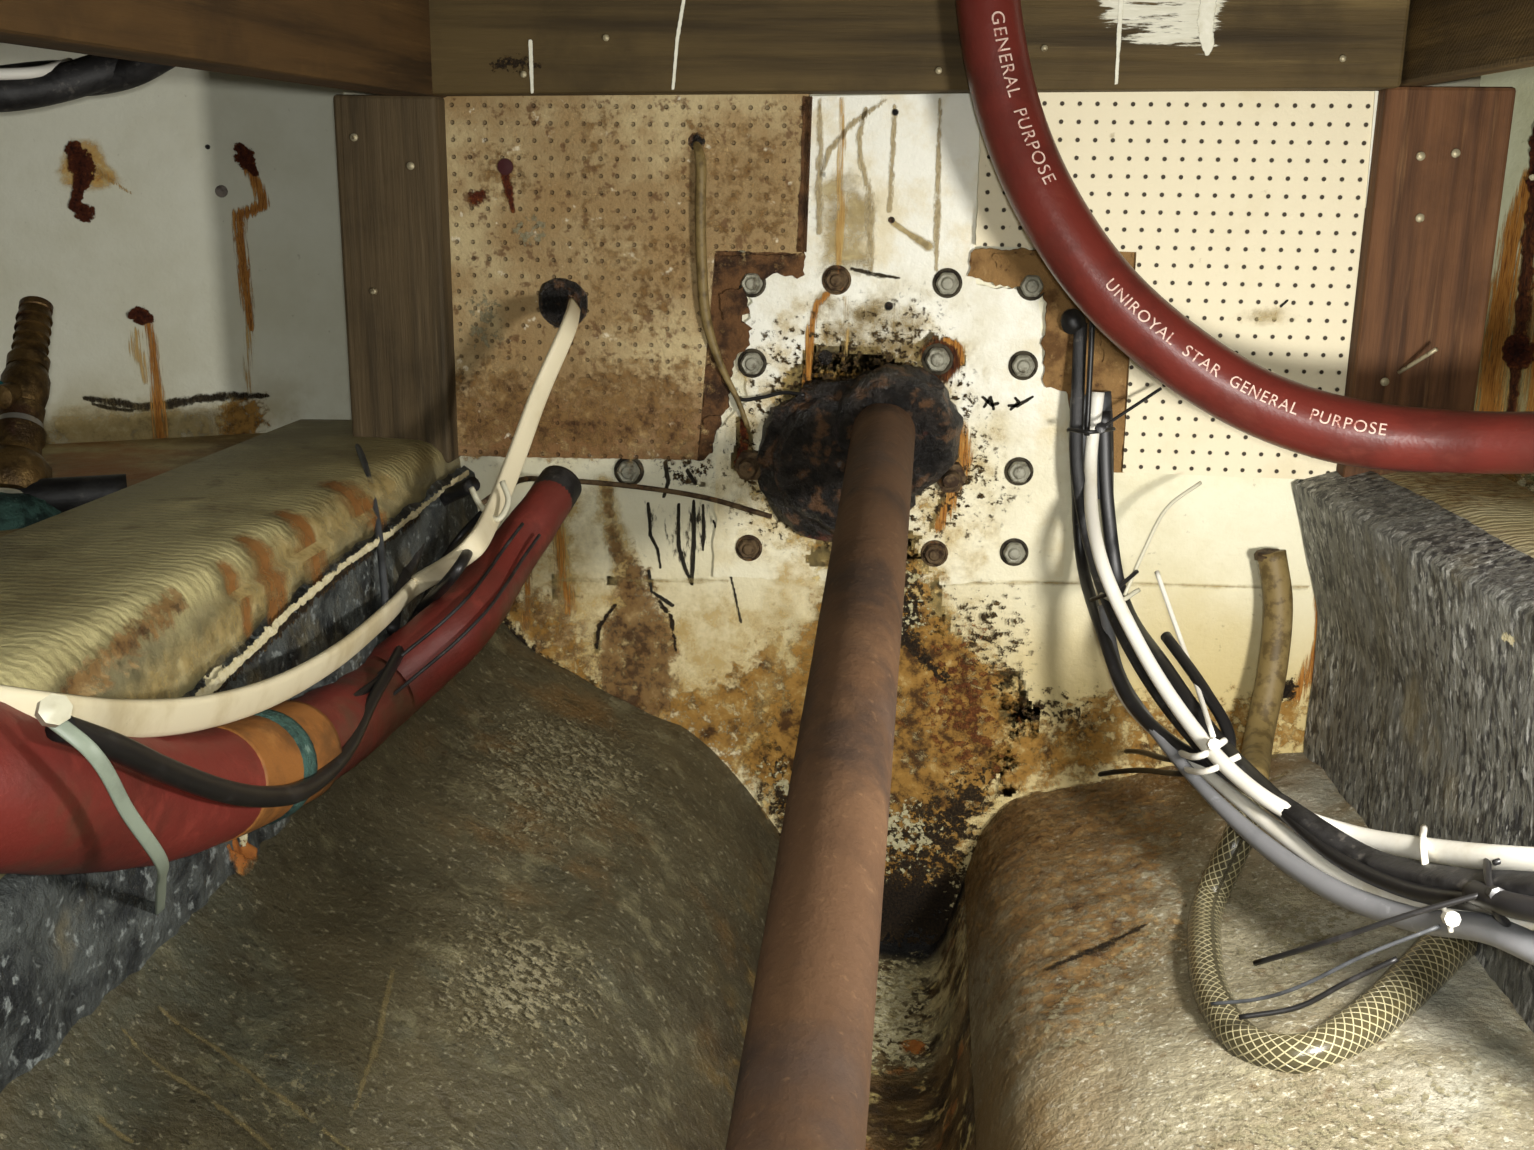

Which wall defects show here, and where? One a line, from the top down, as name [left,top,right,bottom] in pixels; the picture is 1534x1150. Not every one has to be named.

rust [62,141,128,223]
rust [126,306,169,439]
rust [232,142,270,392]
rust [1475,127,1534,412]
rust [591,477,680,717]
water stain [884,547,1183,893]
water stain [1207,687,1253,753]
water stain [1272,679,1310,755]